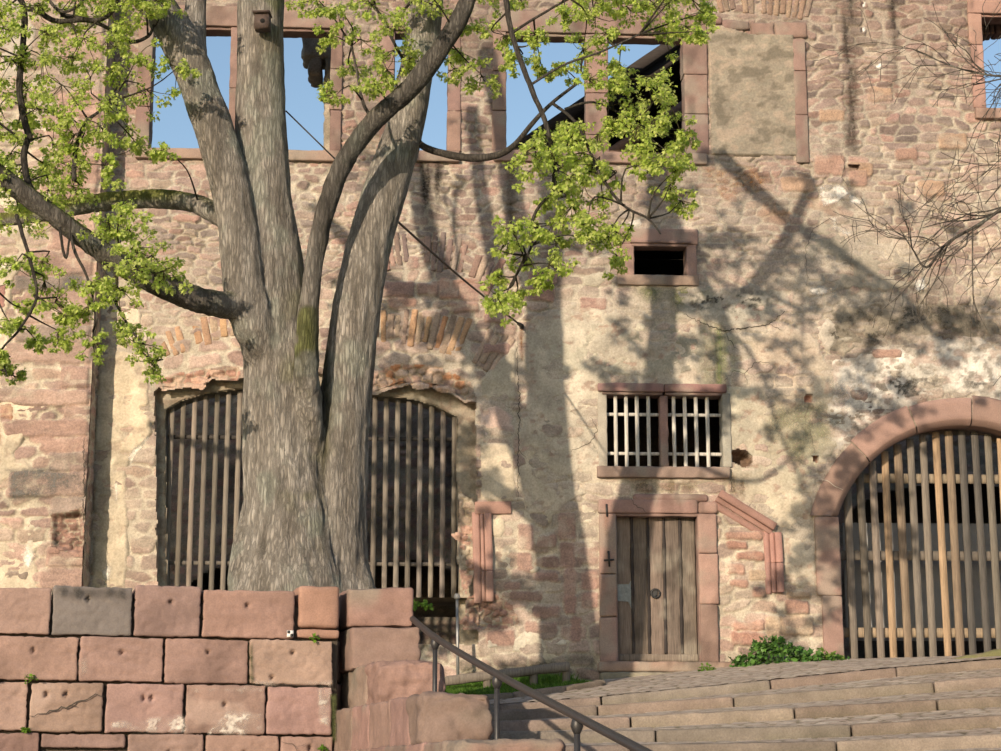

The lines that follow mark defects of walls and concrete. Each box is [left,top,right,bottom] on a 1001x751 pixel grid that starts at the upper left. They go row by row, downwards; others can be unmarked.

water stain [844,0,865,141]
peeling [0,223,40,349]
crack [686,311,785,381]
peeling [0,402,46,485]
peeling [33,269,241,588]
peeling [372,220,1001,631]